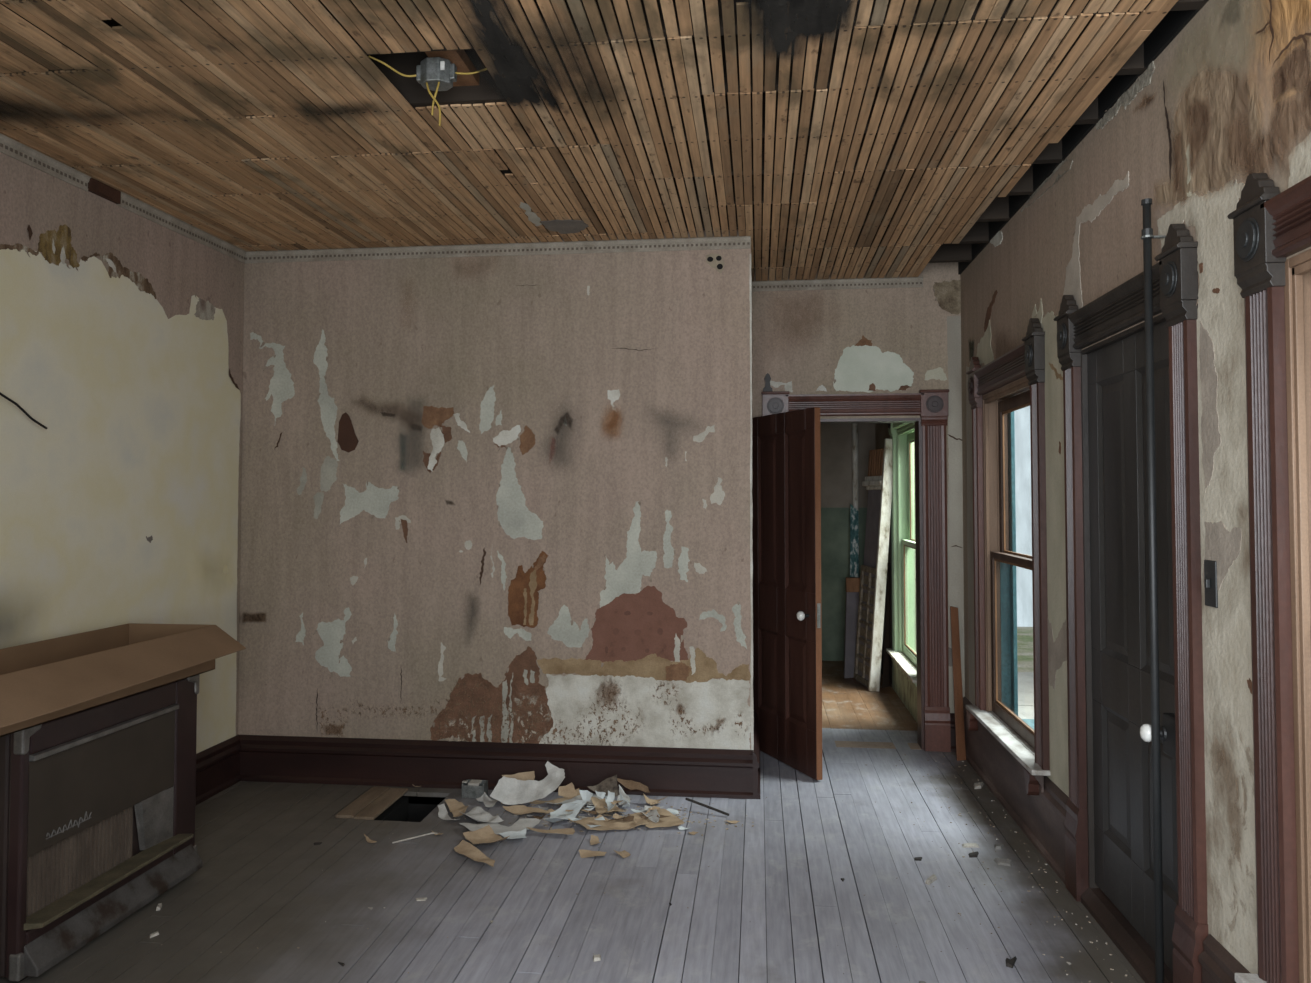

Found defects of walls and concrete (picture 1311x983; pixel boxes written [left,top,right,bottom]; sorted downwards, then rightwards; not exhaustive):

flaking render [1288,132,1311,188]
peeling [1063,171,1129,309]
flaking render [0,224,241,754]
peeling [250,332,295,426]
peeling [313,329,411,543]
flaking render [421,254,754,750]
peeling [770,381,793,392]
flaking render [814,280,998,713]
flaking render [1032,300,1069,797]
peeling [295,607,357,678]
water stain [653,683,746,736]